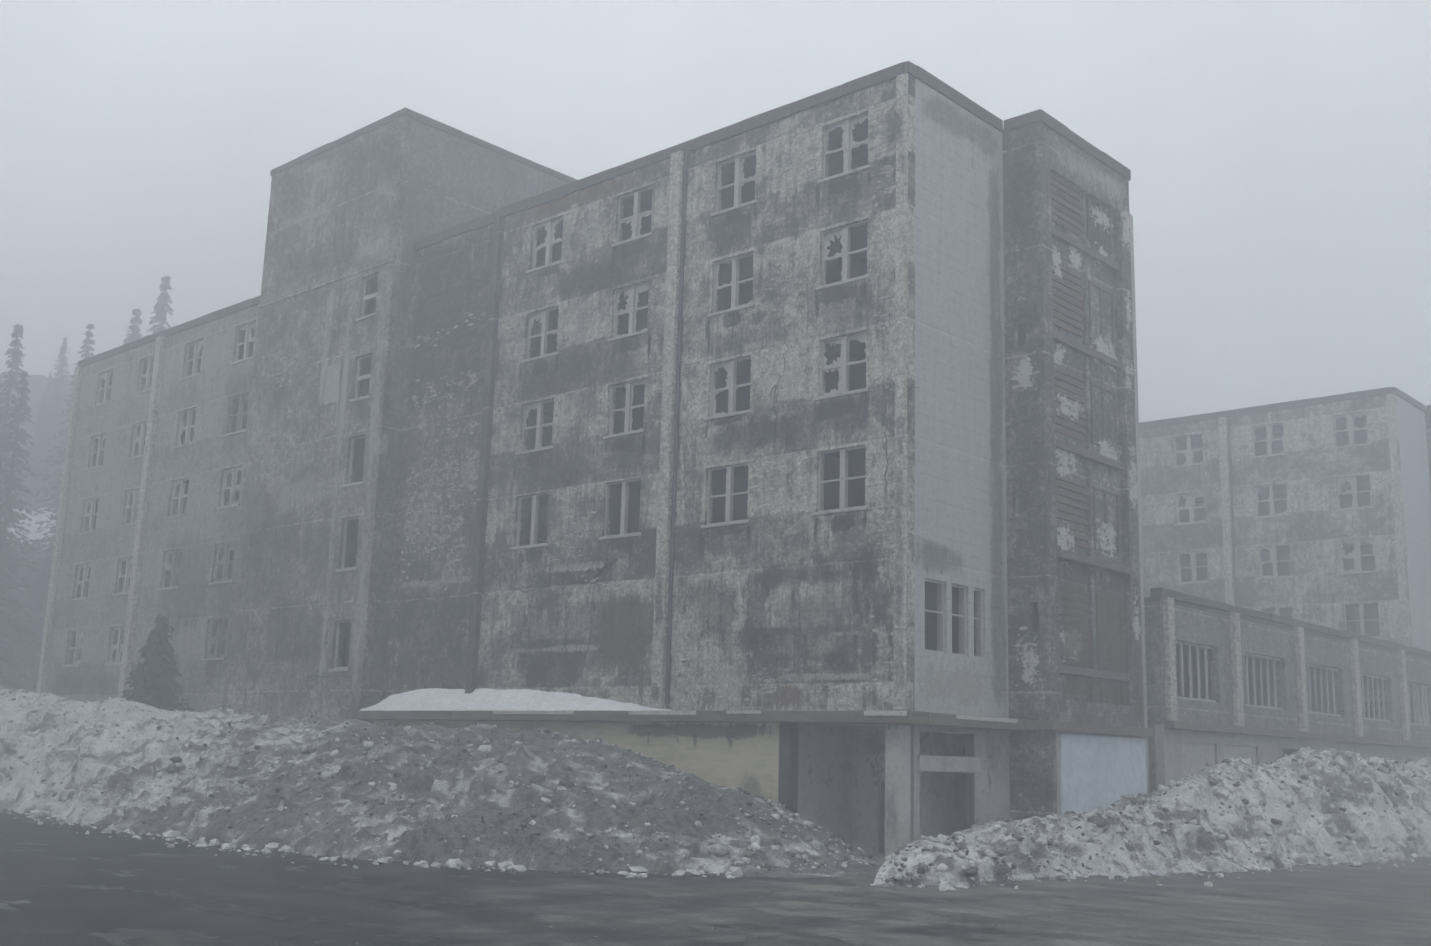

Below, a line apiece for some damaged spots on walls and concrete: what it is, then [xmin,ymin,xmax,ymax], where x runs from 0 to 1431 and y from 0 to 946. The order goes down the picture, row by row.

water stain [815,282,871,316]
water stain [706,310,764,348]
peeling [1007,343,1067,392]
peeling [1090,333,1135,394]
water stain [817,394,869,424]
crack [883,372,917,494]
peeling [1055,392,1086,422]
peeling [397,370,485,579]
water stain [814,511,866,537]
water stain [510,538,633,586]
water stain [746,548,892,682]